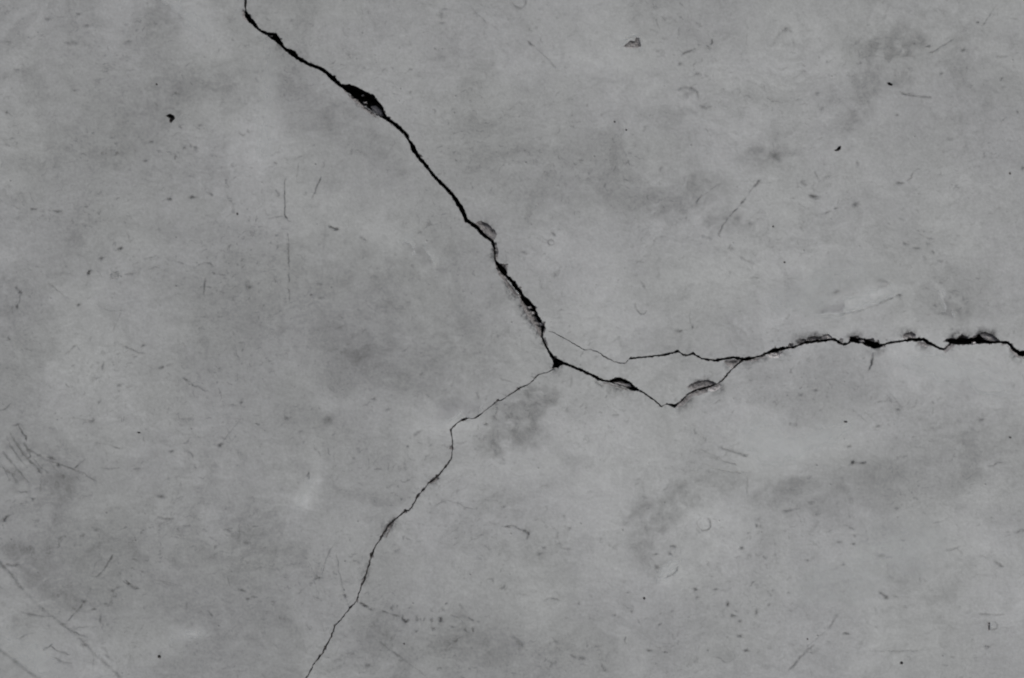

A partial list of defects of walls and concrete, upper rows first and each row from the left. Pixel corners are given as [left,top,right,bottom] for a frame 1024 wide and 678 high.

crack [242,0,1024,678]